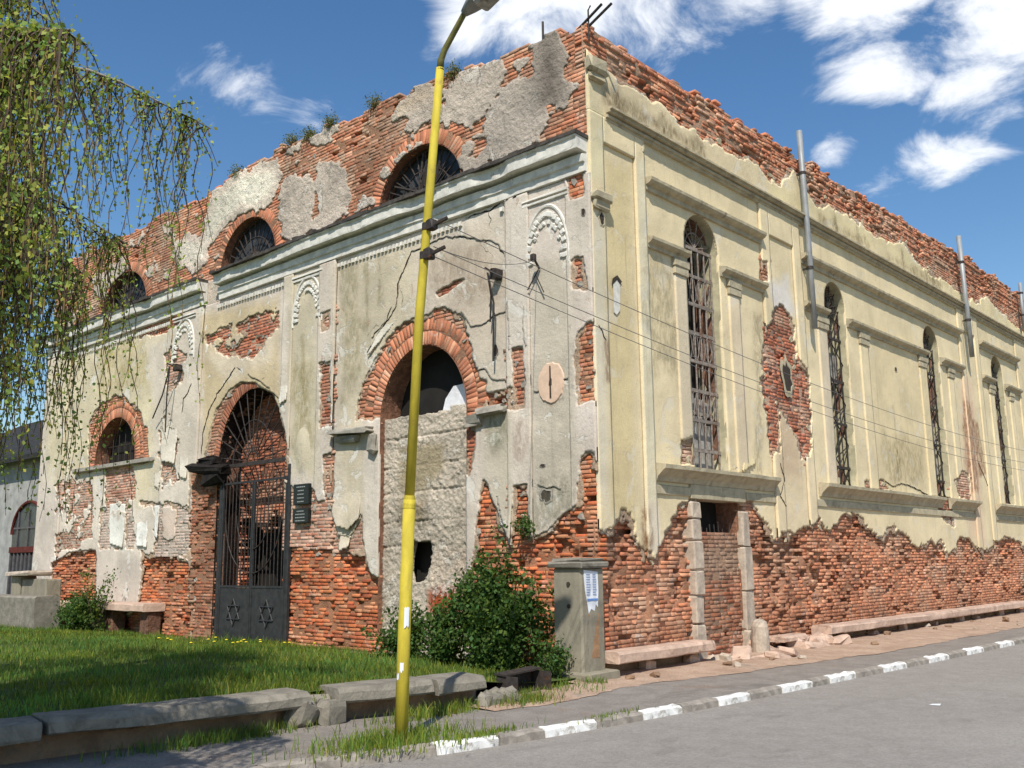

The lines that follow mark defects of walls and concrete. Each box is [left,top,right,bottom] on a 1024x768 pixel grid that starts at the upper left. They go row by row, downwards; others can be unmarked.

flaking render [53,43,534,331]
flaking render [535,23,1024,332]
flaking render [203,311,279,358]
crack [367,195,517,352]
crack [461,306,527,346]
flaking render [579,322,595,402]
flaking render [761,306,812,466]
flaking render [52,395,226,639]
flaking render [282,447,391,654]
flaking render [473,453,703,664]
flaking render [726,501,1024,646]
flaking render [938,473,972,523]